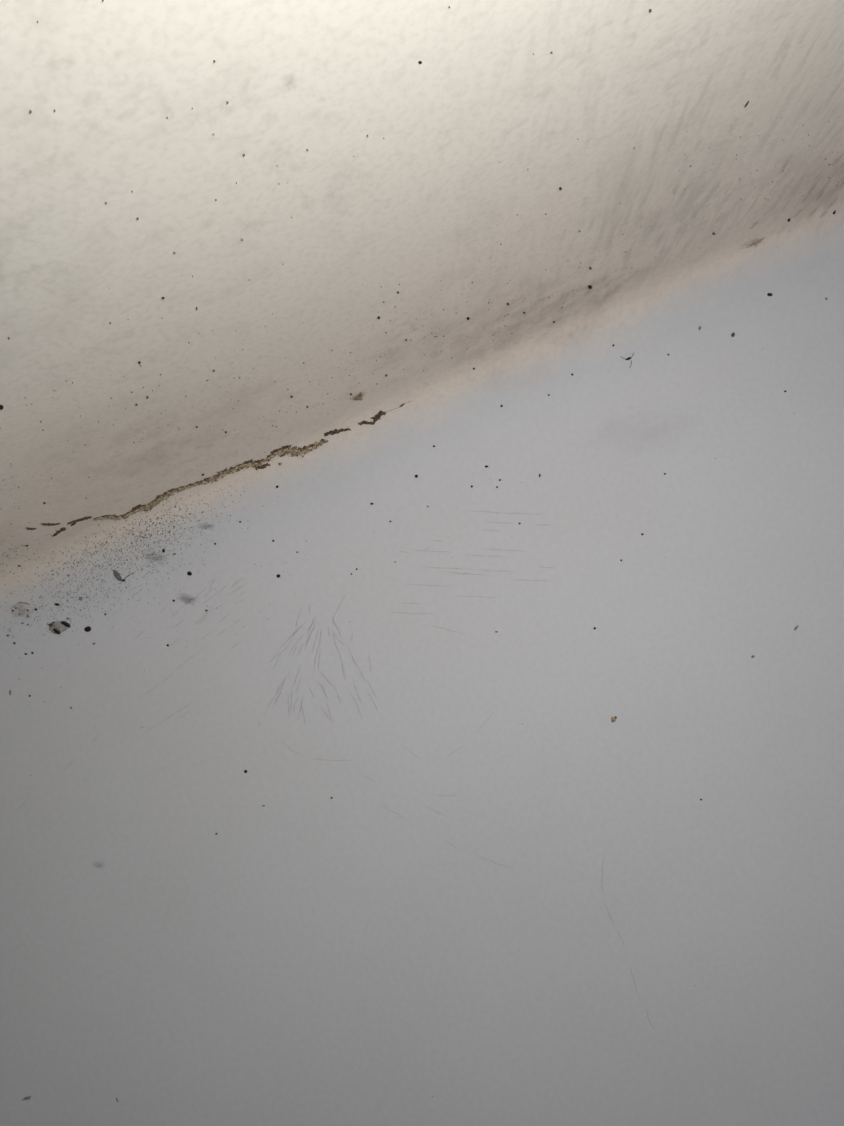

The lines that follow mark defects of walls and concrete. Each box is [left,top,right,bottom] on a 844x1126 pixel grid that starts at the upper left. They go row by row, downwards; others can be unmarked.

crack [26,403,405,537]